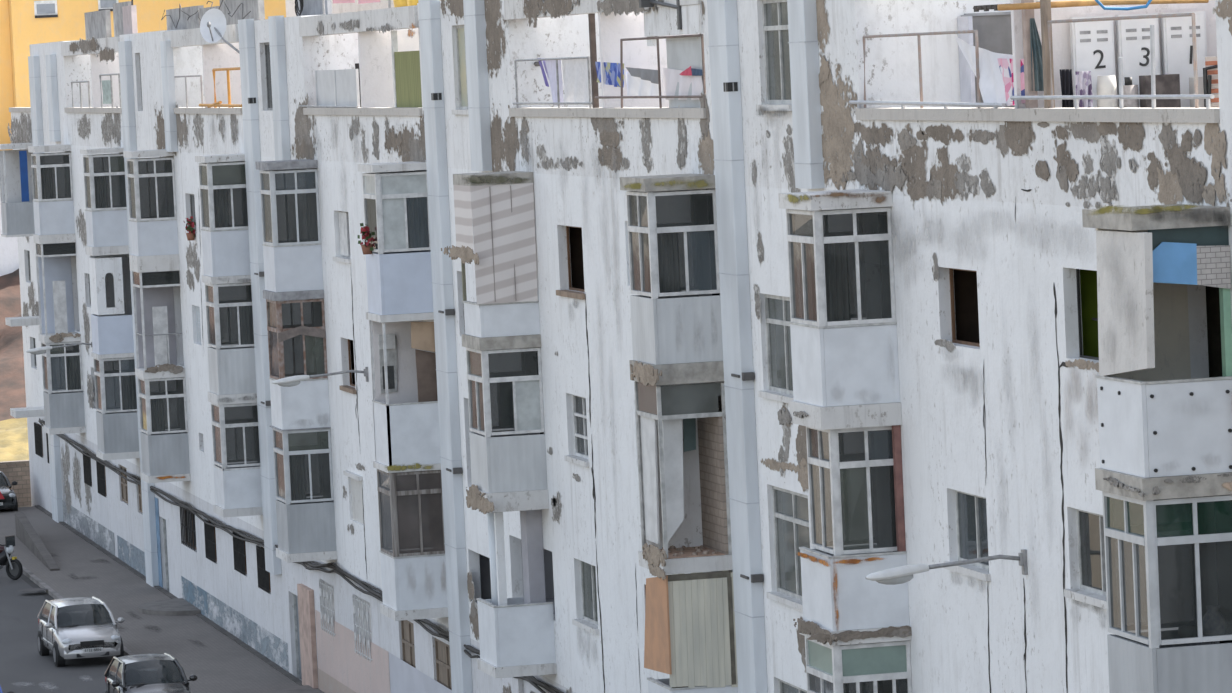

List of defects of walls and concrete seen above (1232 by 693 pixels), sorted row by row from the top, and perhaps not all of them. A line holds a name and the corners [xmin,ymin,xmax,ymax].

peeling [68,37,119,64]
peeling [484,0,510,79]
peeling [290,93,318,160]
peeling [348,110,426,163]
peeling [490,98,583,172]
peeling [590,117,654,173]
peeling [676,92,715,190]
peeling [816,0,1232,210]
peeling [761,402,809,492]
crack [1053,284,1068,690]
rust [797,552,883,628]
spalling [793,616,912,673]